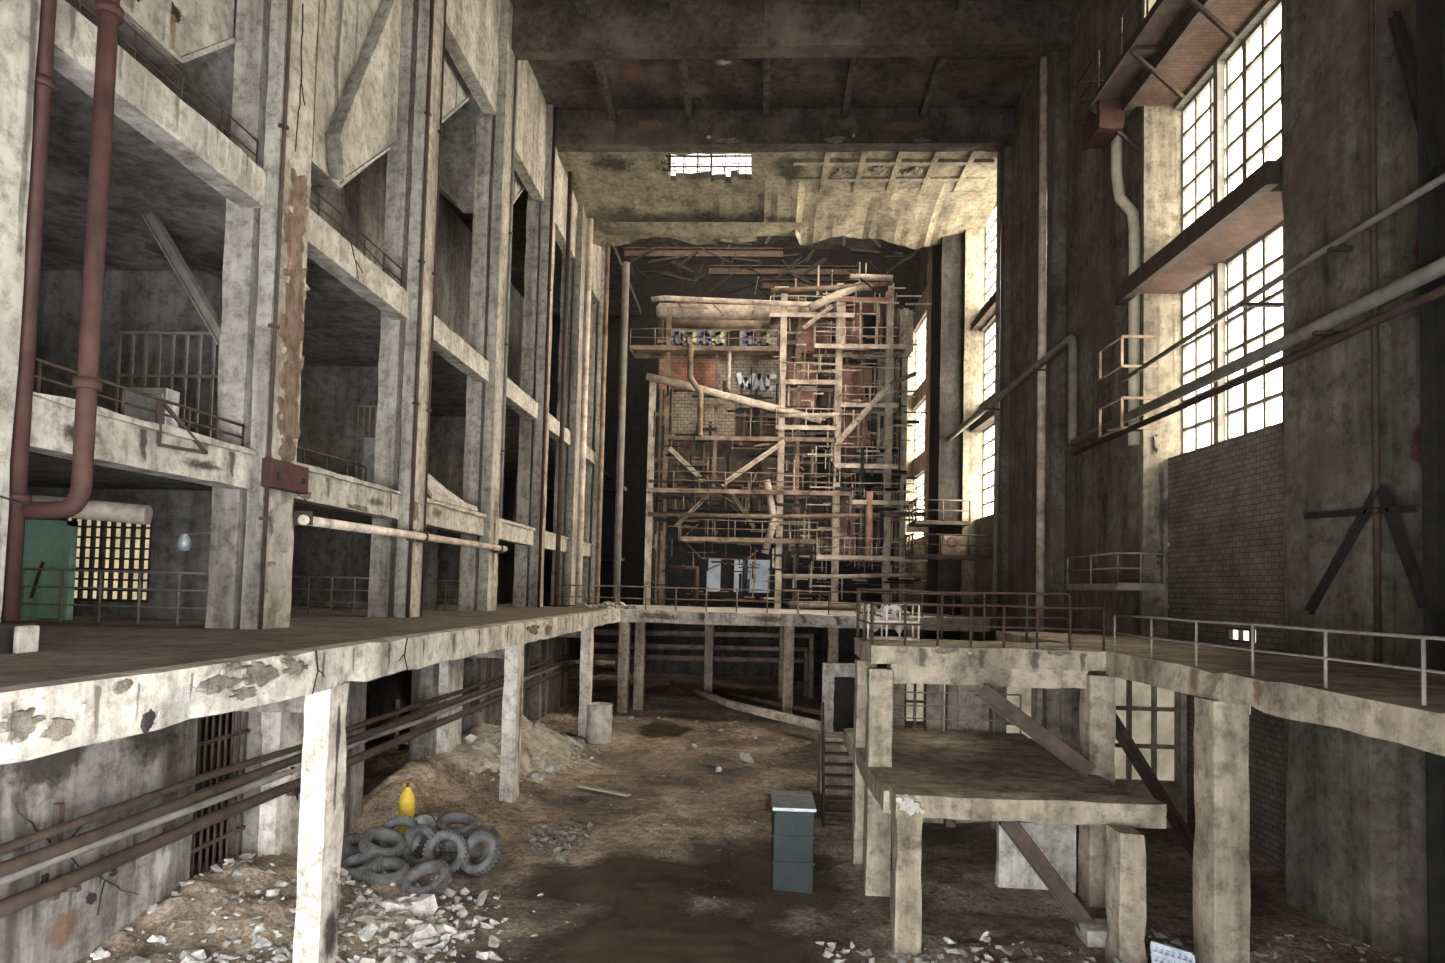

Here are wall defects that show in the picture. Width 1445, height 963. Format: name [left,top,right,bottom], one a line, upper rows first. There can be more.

corrosion [283,189,304,430]
spalling [190,653,313,701]
spalling [0,699,87,743]